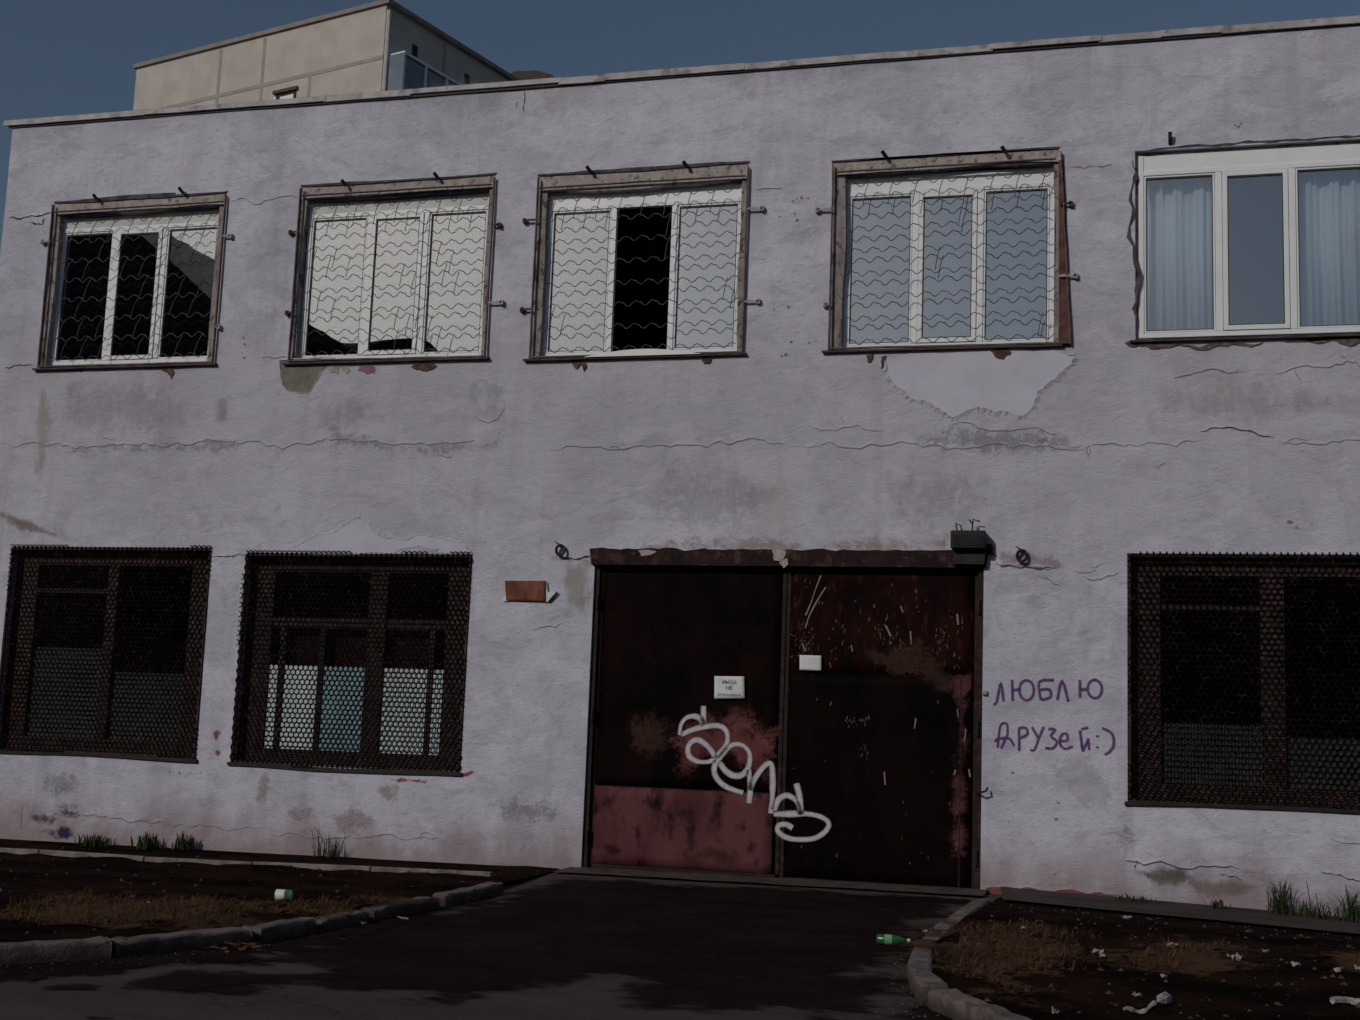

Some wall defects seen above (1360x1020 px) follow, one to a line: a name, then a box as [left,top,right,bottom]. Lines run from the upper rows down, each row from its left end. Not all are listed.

spalling [1127,160,1141,323]
spalling [262,356,375,394]
flaking render [881,348,1079,422]
crack [2,405,505,458]
crack [550,417,1360,468]